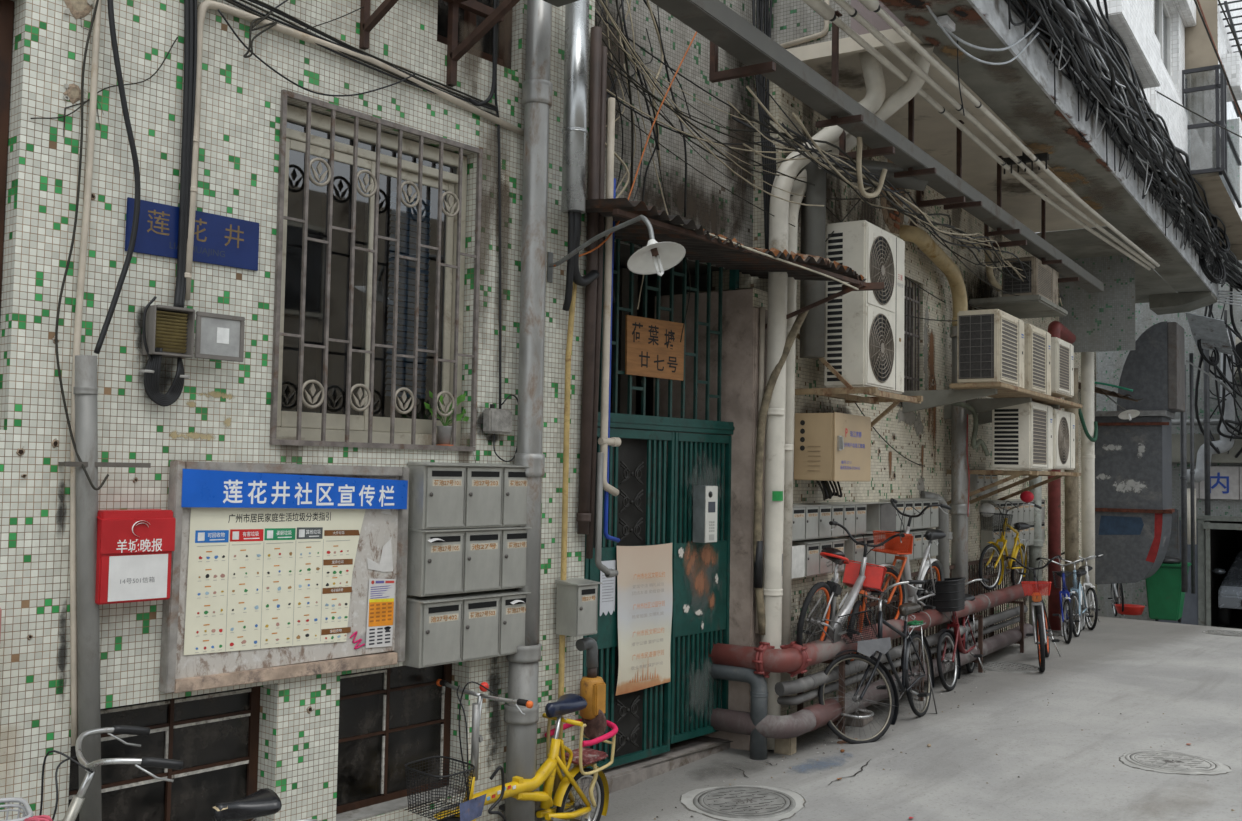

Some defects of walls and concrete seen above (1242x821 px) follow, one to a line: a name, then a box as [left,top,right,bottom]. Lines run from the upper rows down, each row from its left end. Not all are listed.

peeling [1096,473,1147,493]
crack [719,759,871,821]
crack [680,795,727,821]